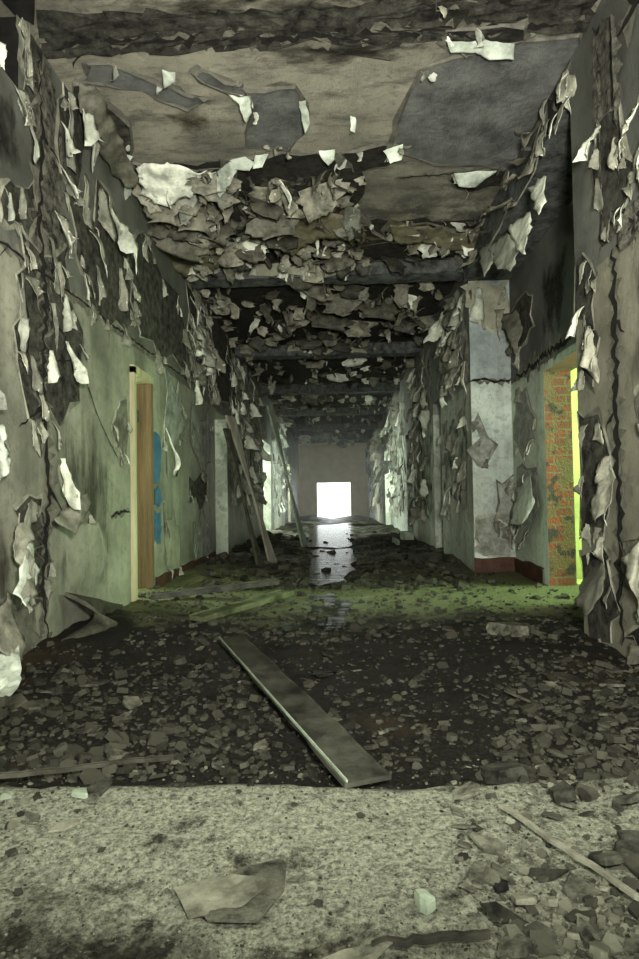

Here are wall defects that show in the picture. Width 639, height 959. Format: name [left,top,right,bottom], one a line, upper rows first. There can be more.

crack [0,14,590,638]
peeling [0,0,639,665]
crack [606,200,639,645]